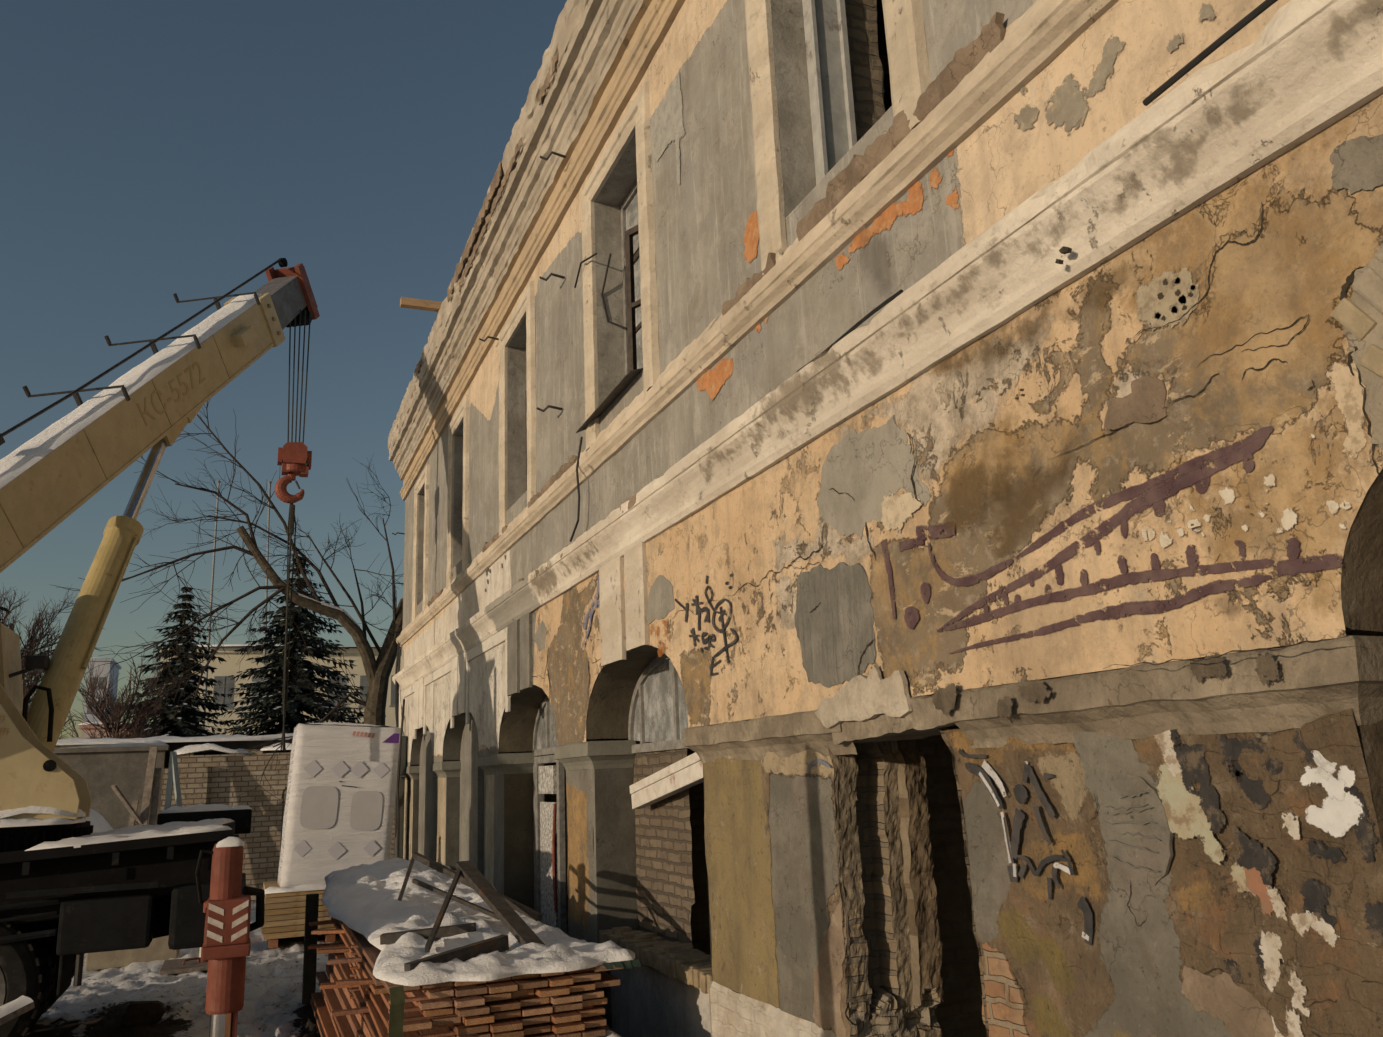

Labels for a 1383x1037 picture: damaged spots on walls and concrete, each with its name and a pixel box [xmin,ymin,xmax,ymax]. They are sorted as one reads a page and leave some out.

spalling [796,12,1006,241]
spalling [1014,35,1125,137]
spalling [722,211,776,316]
spalling [1135,263,1200,331]
crack [1339,266,1365,300]
crack [1033,423,1131,478]
crack [1162,314,1314,409]
spalling [1326,244,1383,458]
crack [1347,346,1379,479]
peeling [1153,728,1379,1037]
spalling [813,895,850,1037]
spalling [982,942,1031,1037]